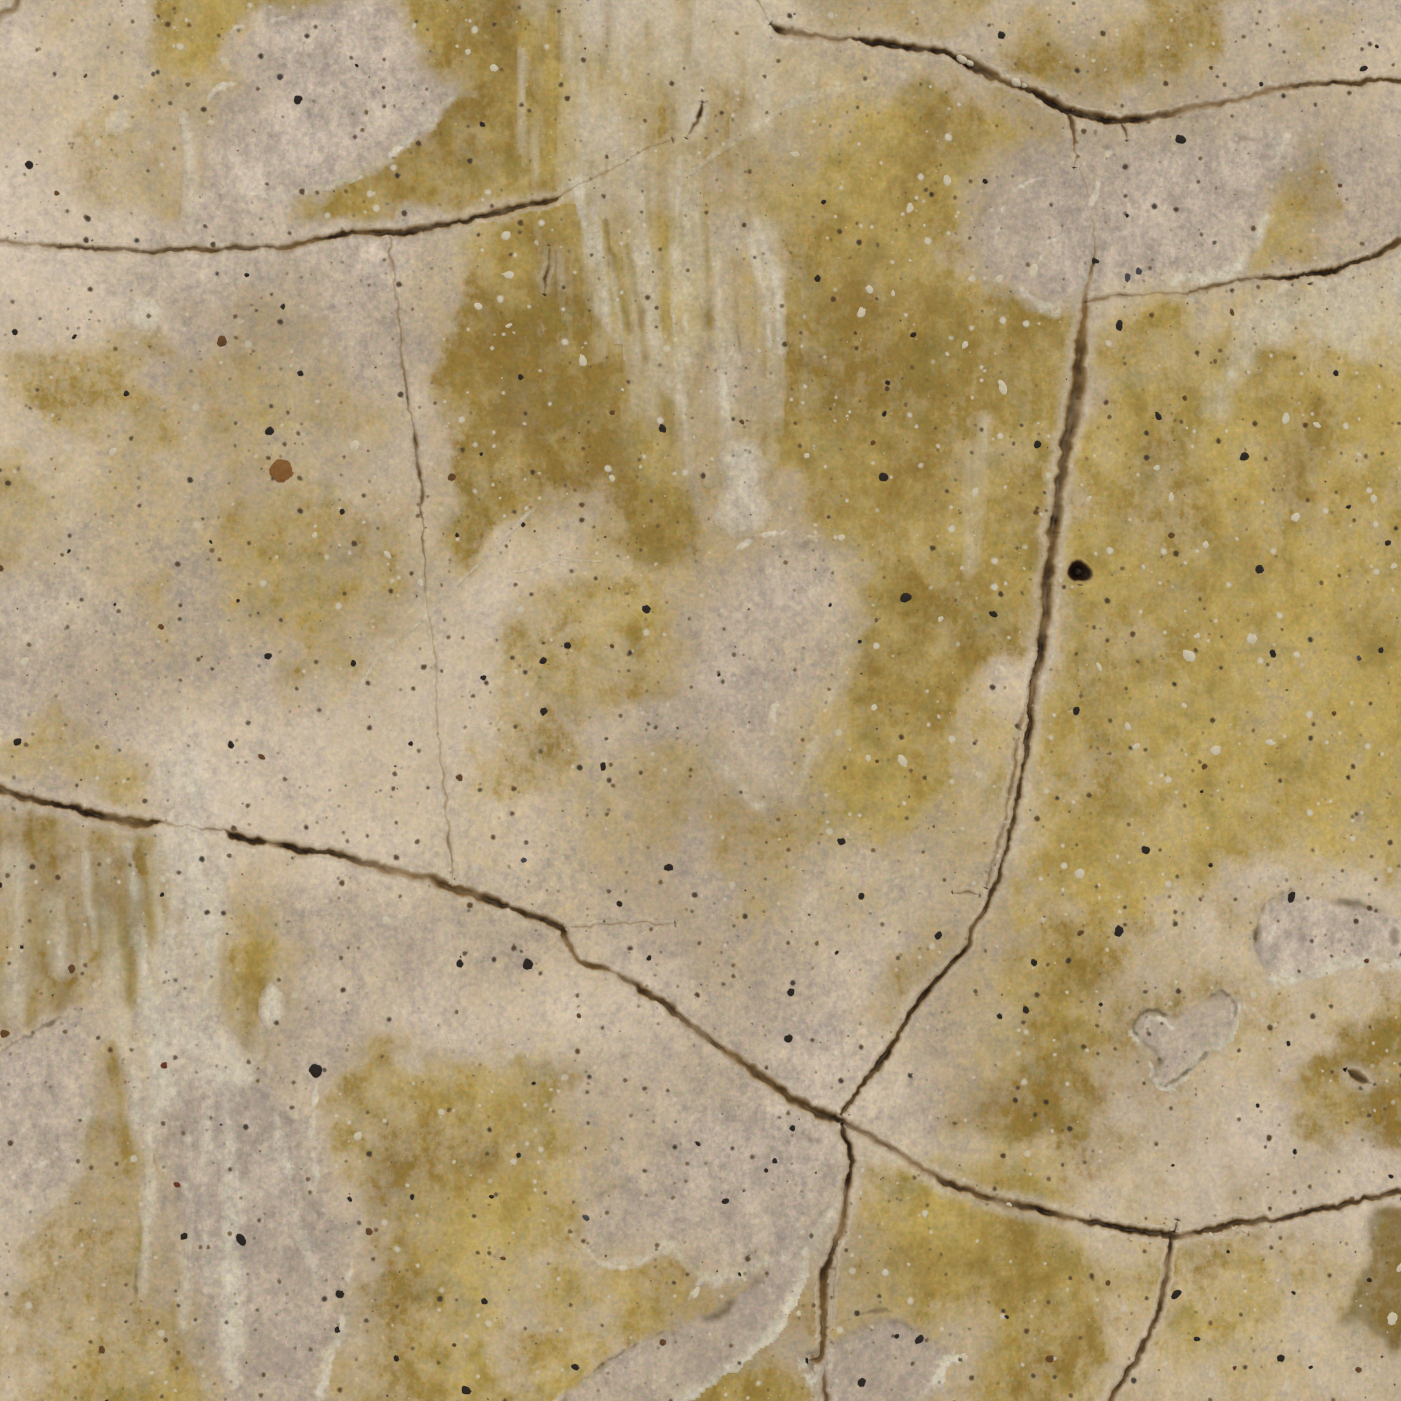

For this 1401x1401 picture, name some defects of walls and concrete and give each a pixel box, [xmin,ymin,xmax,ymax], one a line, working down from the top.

crack [750,0,1401,167]
leakage [0,692,273,1401]
crack [0,136,673,878]
leakage [307,1015,593,1401]
leakage [0,0,1076,945]
peeling [549,1085,843,1401]
crack [0,780,1401,1401]
peeling [793,1307,967,1401]
crack [837,166,1401,1117]
leakage [842,122,1401,1401]
peeling [1127,980,1241,1094]
peeling [1249,886,1401,987]